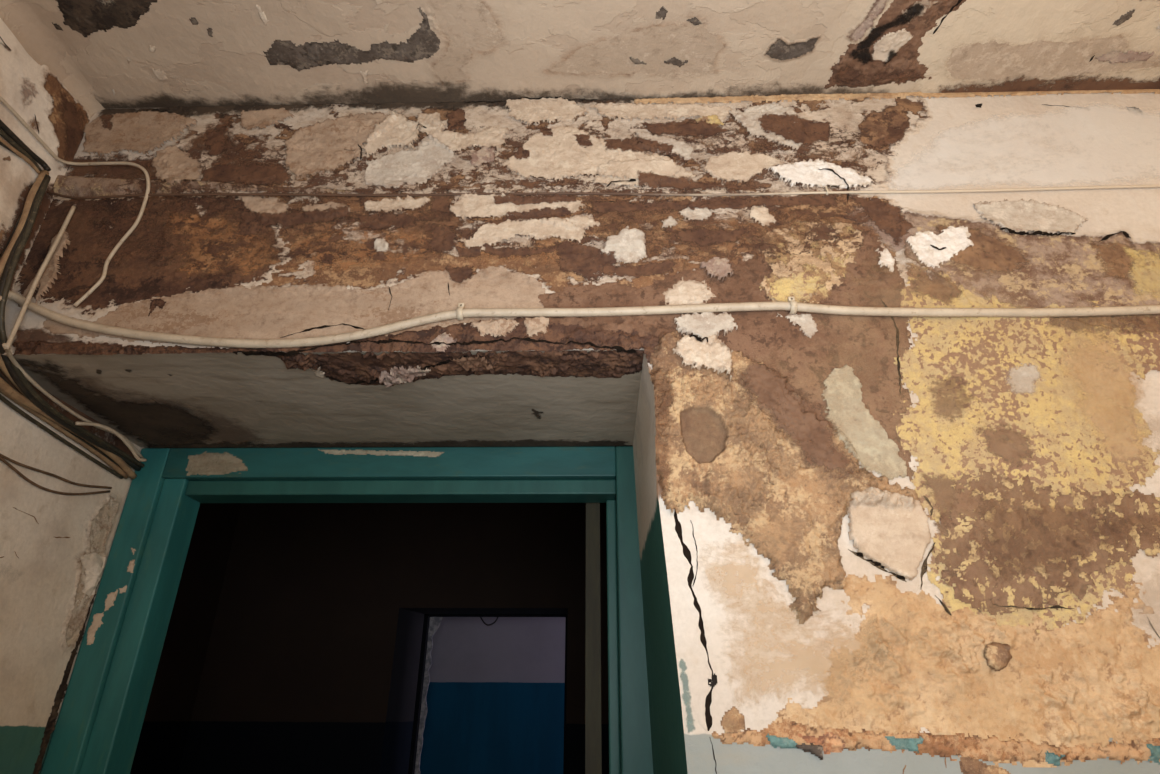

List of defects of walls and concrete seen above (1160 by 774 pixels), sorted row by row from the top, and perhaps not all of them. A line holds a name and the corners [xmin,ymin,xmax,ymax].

spalling [52,0,157,38]
peeling [824,0,1160,89]
peeling [82,96,1160,308]
peeling [18,231,71,307]
spalling [148,298,166,316]
flaking render [12,311,1160,774]
crack [848,495,952,616]
crack [667,510,718,774]